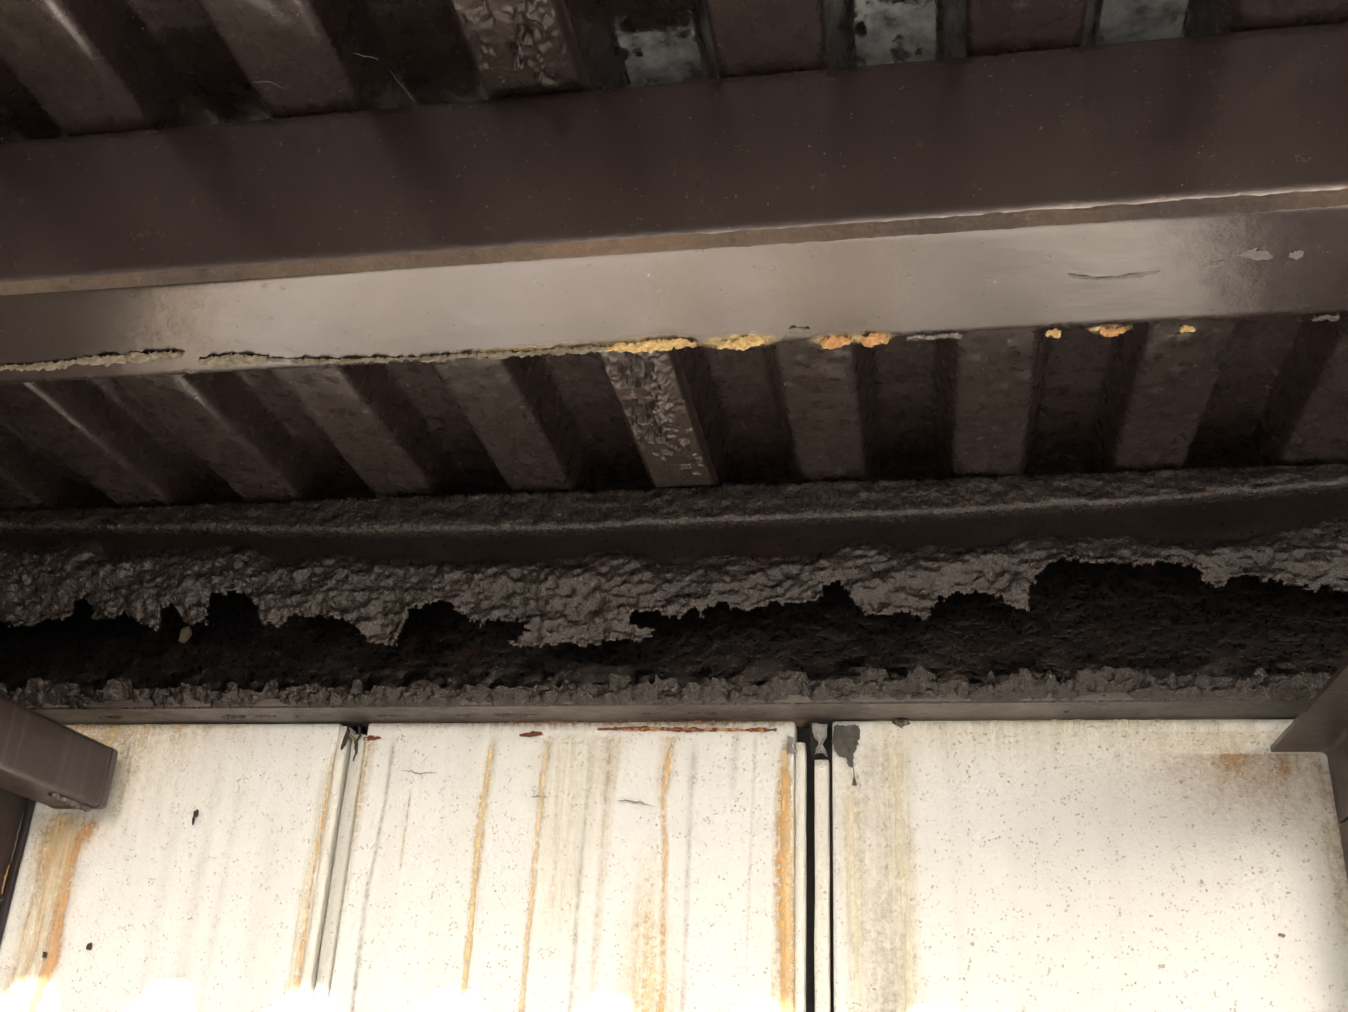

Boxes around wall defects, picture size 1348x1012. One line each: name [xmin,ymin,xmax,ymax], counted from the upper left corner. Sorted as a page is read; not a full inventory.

peeling [0,350,184,371]
peeling [198,337,697,368]
rust [497,721,577,737]
rust [597,720,785,733]
rust [661,756,671,891]
rust [777,749,795,1012]
rust [9,815,95,1012]